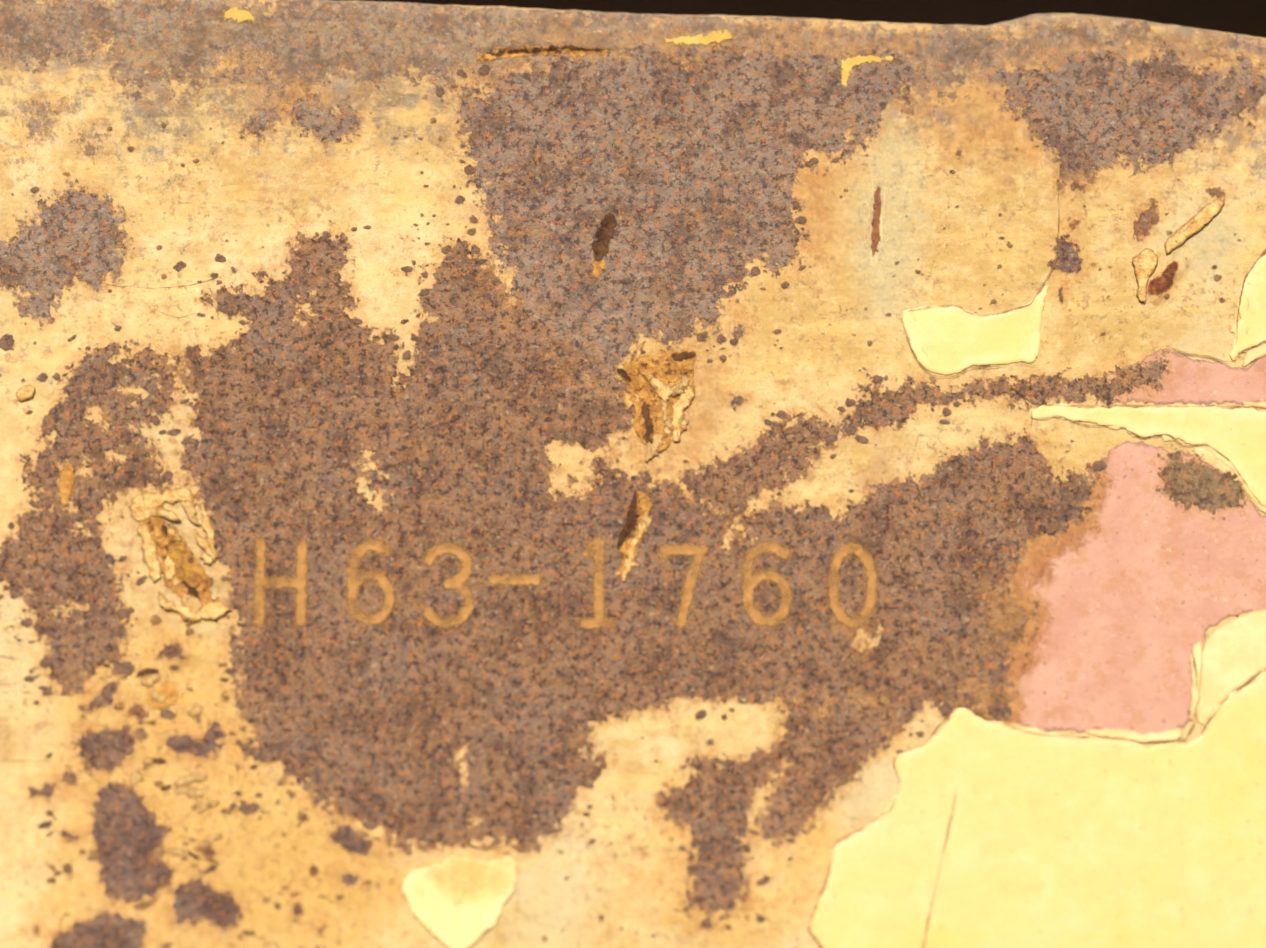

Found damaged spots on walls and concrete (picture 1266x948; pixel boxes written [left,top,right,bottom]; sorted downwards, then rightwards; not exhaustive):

rust [985,44,1266,194]
rust [0,179,137,329]
peeling [901,253,1058,377]
rust [1047,219,1084,303]
peeling [1044,248,1266,408]
rust [1148,261,1178,295]
peeling [1004,431,1266,743]
crack [893,704,960,763]
rust [21,702,244,948]
rust [328,824,379,858]
peeling [402,856,517,948]
crack [810,806,893,948]